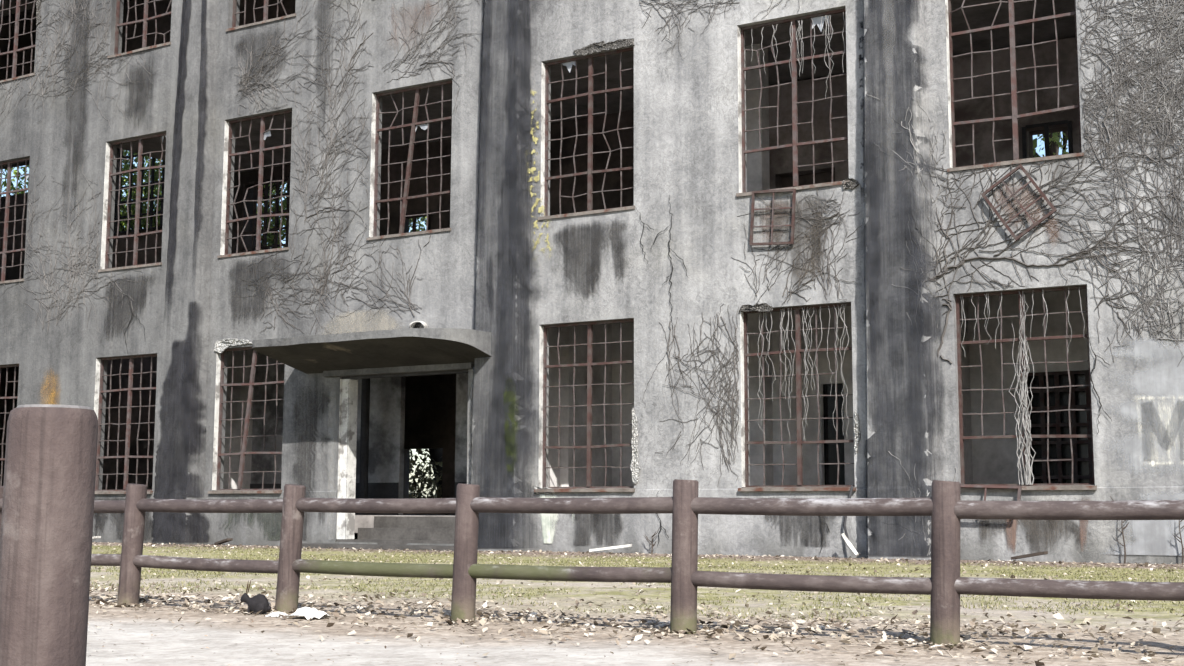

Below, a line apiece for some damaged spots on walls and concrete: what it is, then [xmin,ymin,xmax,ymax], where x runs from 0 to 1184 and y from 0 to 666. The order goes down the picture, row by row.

water stain [471,0,555,498]
water stain [556,222,624,297]
water stain [859,0,944,498]
water stain [478,512,557,549]
water stain [574,514,622,546]
water stain [766,515,834,547]
water stain [865,516,931,557]
rust [1006,520,1017,550]